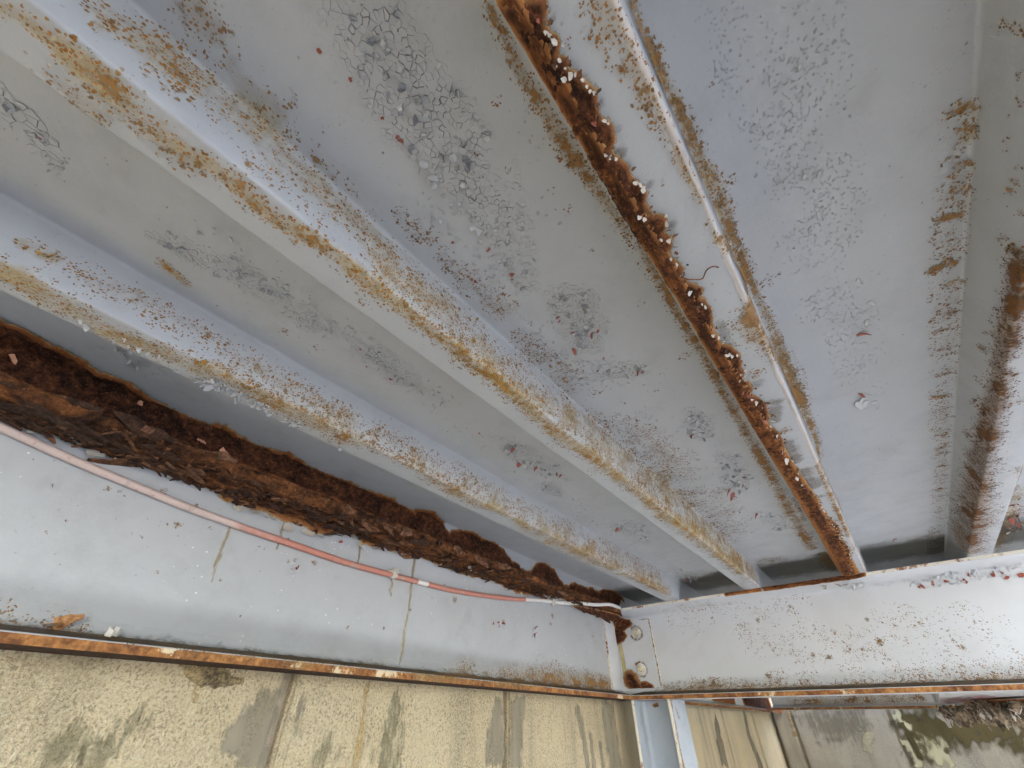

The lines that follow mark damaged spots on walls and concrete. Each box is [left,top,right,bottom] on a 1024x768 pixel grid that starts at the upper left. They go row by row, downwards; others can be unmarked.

corrosion [0,0,866,596]
corrosion [924,98,1024,554]
peeling [676,407,723,442]
corrosion [0,318,1024,713]
water stain [43,712,142,768]
water stain [222,690,281,768]
water stain [486,696,525,768]
water stain [577,700,621,768]
water stain [806,710,874,754]
water stain [892,709,955,768]